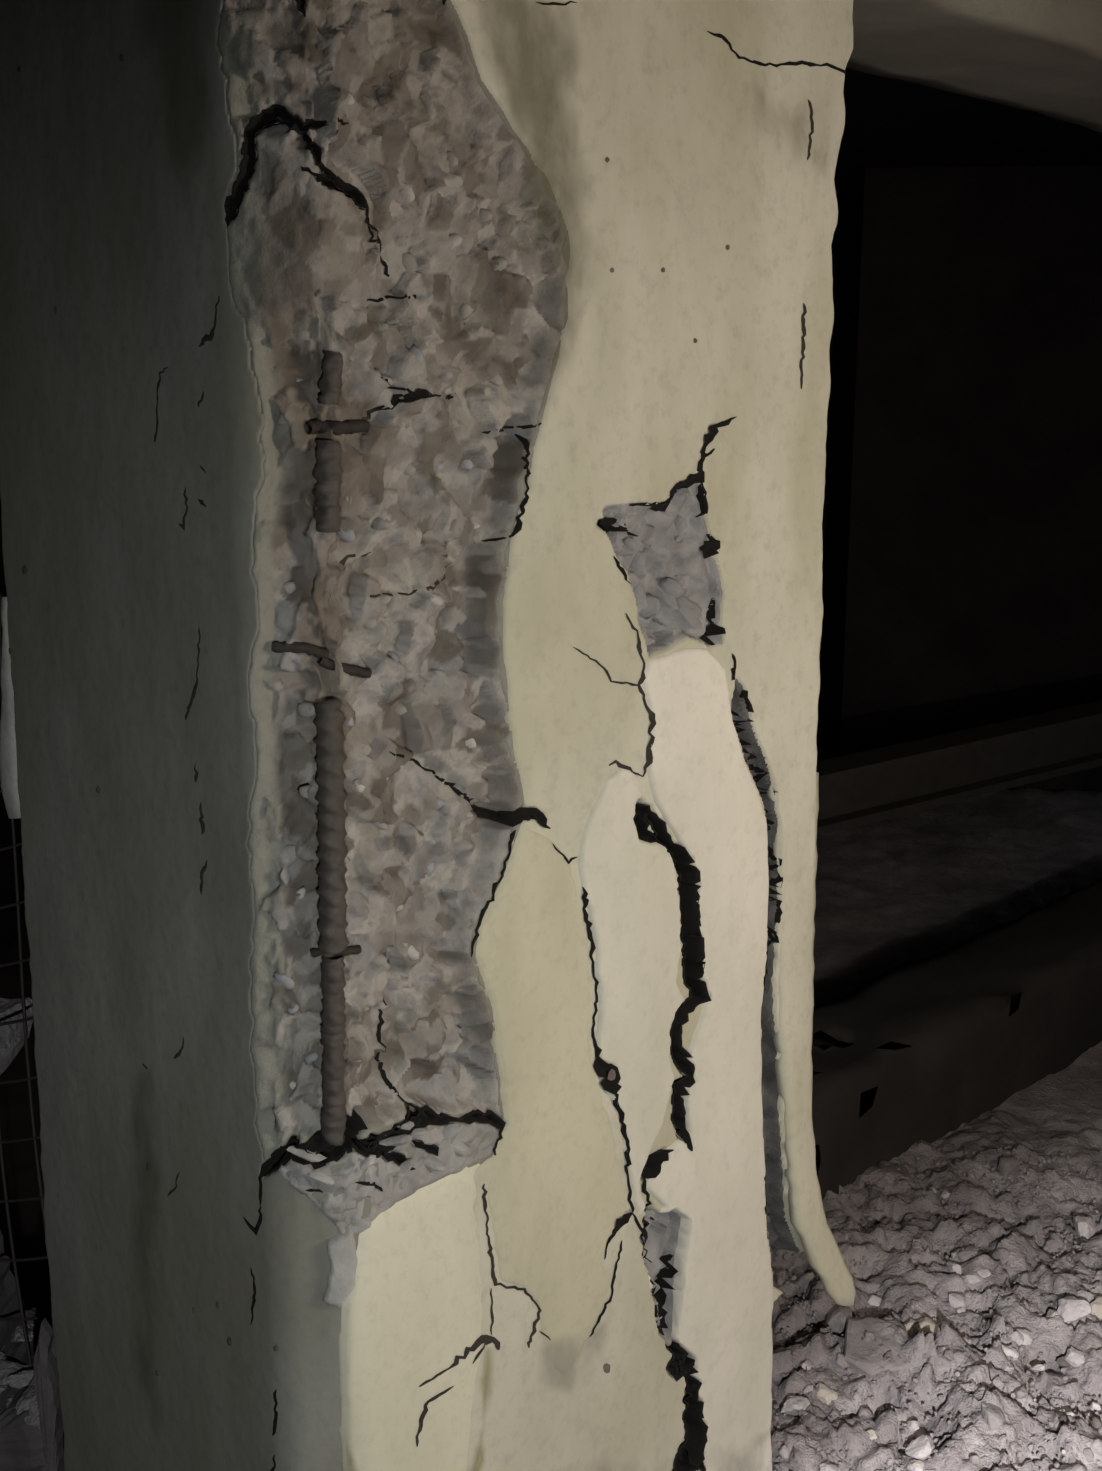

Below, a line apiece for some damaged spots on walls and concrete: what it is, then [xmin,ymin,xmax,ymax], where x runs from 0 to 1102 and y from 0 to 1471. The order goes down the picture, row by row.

crack [536,0,577,8]
crack [707,31,846,160]
crack [224,104,416,302]
crack [799,303,807,389]
spalling [598,483,723,655]
spalling [217,0,684,1471]
crack [701,598,783,1002]
crack [389,416,737,1471]
crack [243,997,551,1447]
crack [762,1177,770,1239]
crack [270,1390,278,1471]